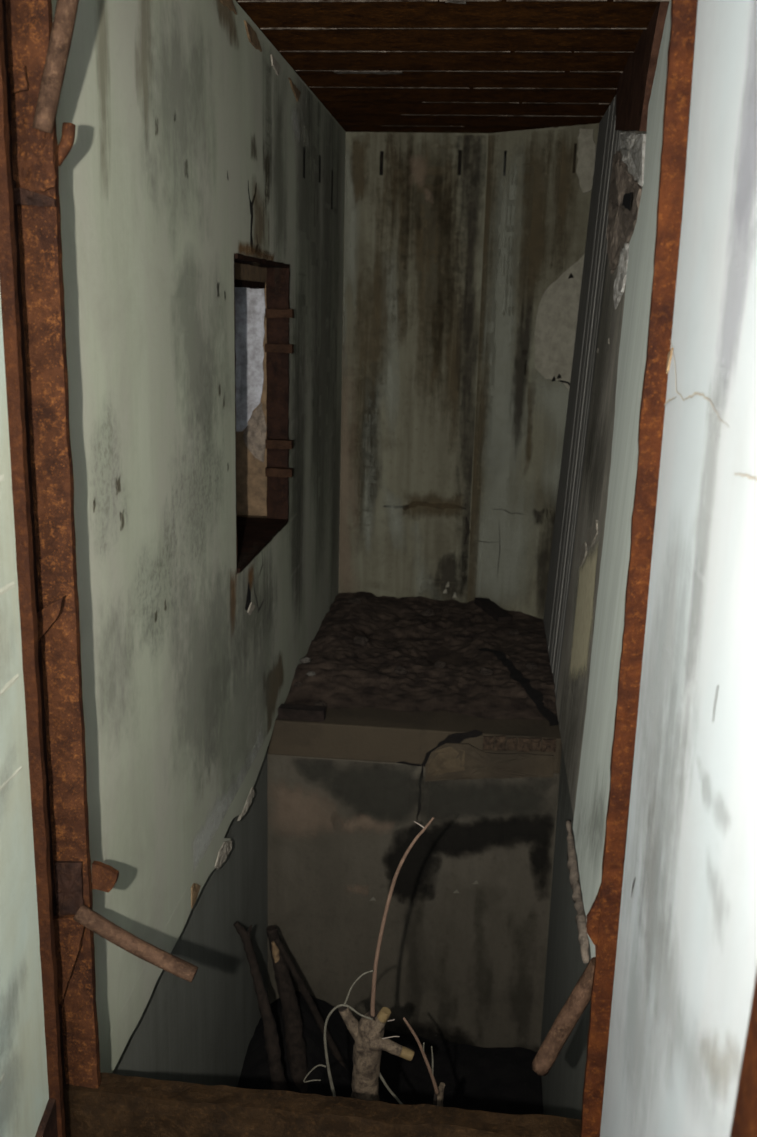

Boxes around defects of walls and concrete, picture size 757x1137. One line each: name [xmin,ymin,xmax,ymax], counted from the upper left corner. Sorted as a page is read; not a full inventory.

peeling [576,129,597,193]
spalling [606,131,646,309]
water stain [296,70,617,609]
crack [664,339,729,427]
water stain [277,760,553,901]
crack [396,730,483,825]